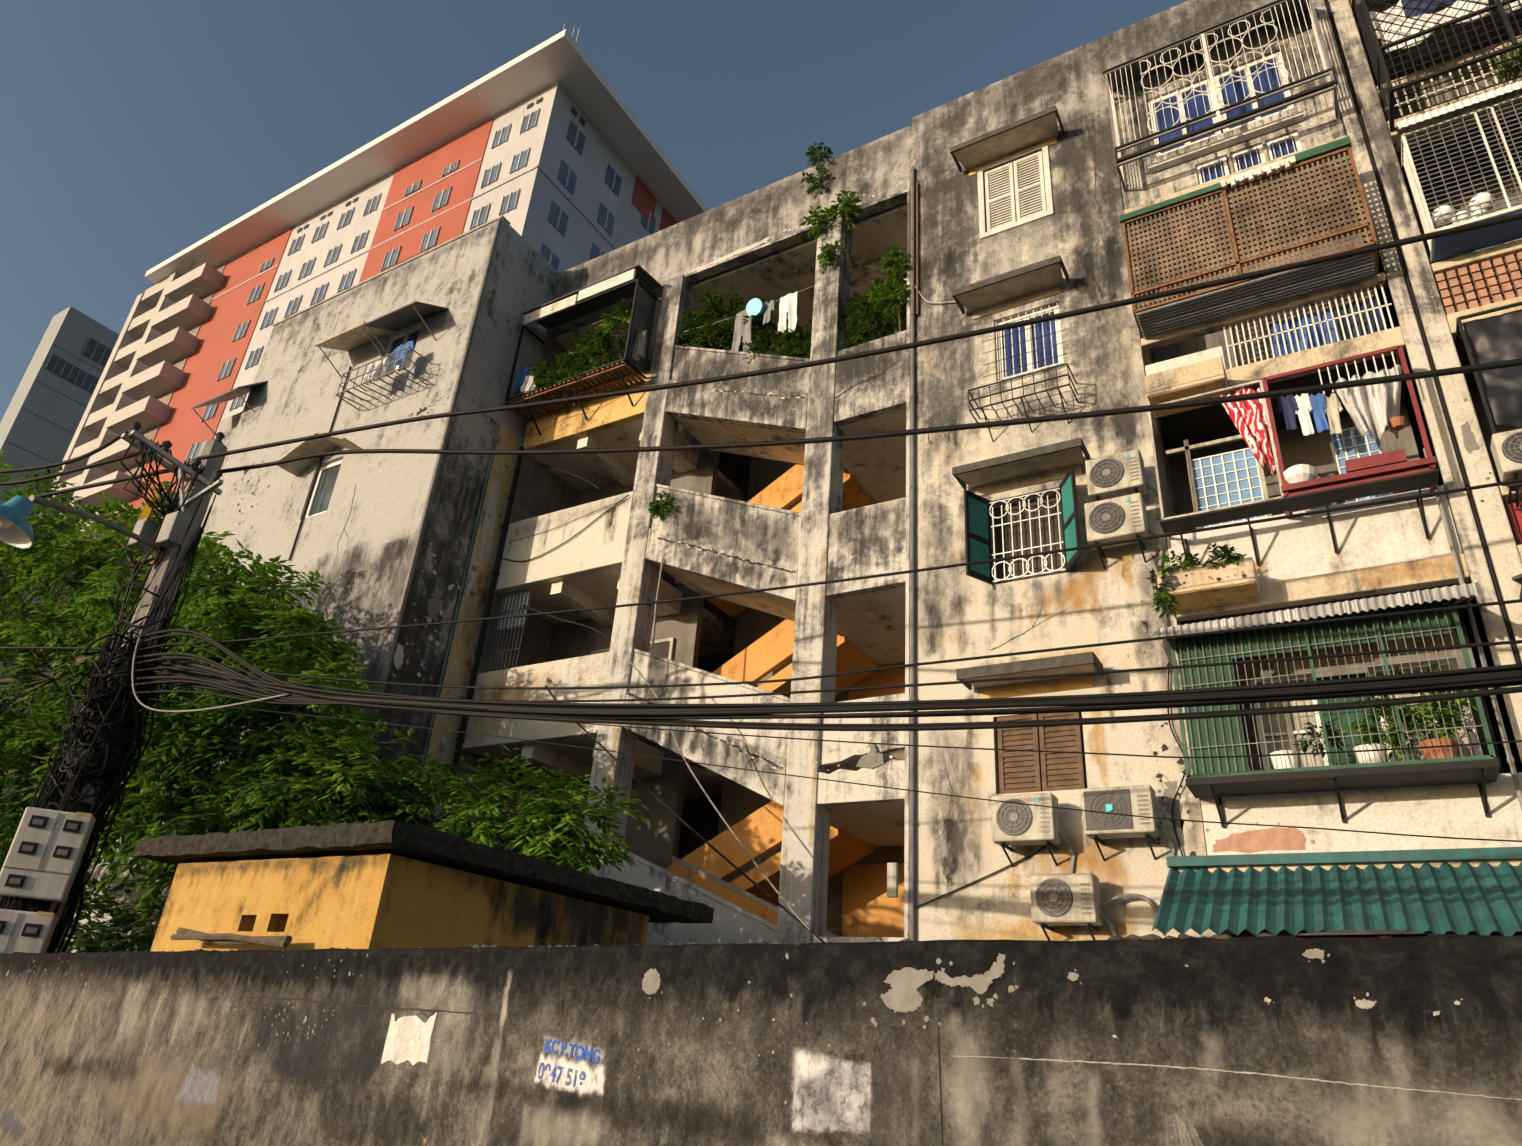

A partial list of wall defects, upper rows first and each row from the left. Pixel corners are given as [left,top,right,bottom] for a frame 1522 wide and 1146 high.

leakage [671,502,788,583]
leakage [307,541,415,762]
flaking render [1148,721,1316,870]
leakage [470,879,644,946]
leakage [500,982,509,1024]
peeling [642,968,677,1004]
peeling [863,953,1019,1029]
peeling [1302,948,1330,963]
peeling [1354,992,1377,1010]
leakage [255,998,427,1146]